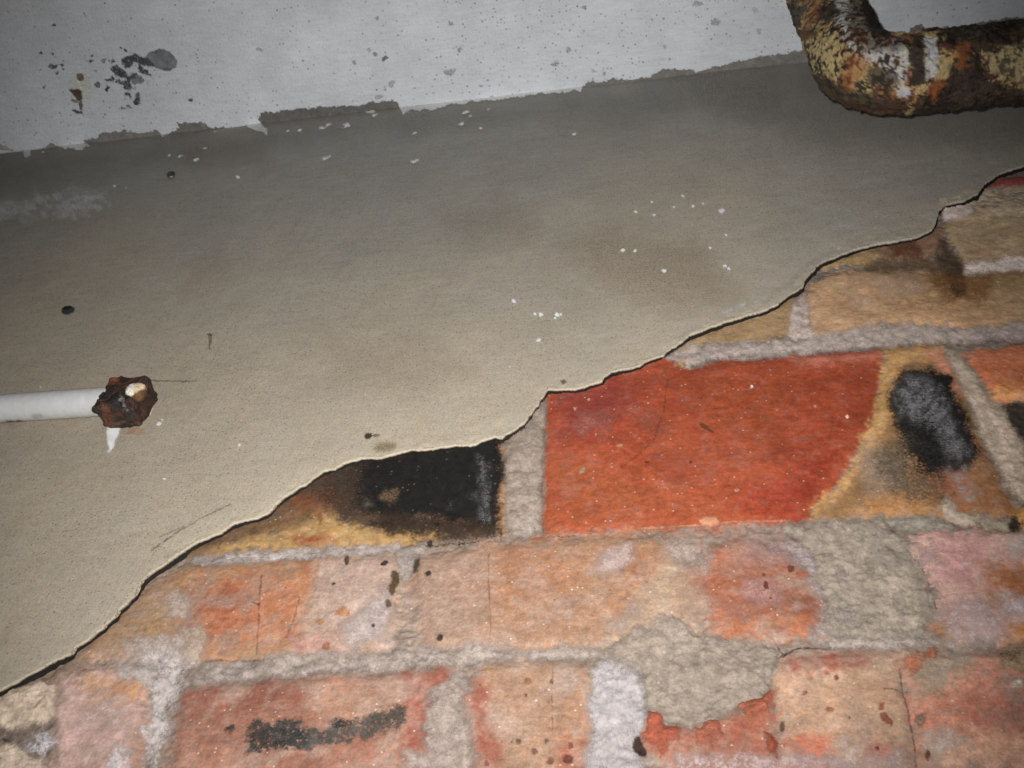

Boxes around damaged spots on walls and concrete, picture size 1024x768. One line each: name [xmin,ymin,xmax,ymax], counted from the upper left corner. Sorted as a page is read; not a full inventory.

water stain [895,377,976,500]
water stain [363,488,399,506]
water stain [471,456,491,523]
spalling [641,516,791,530]
peeling [884,515,954,533]
spalling [998,643,1024,687]
spalling [738,690,775,718]
spalling [640,711,723,754]
spalling [764,723,784,753]
spalling [547,743,573,764]